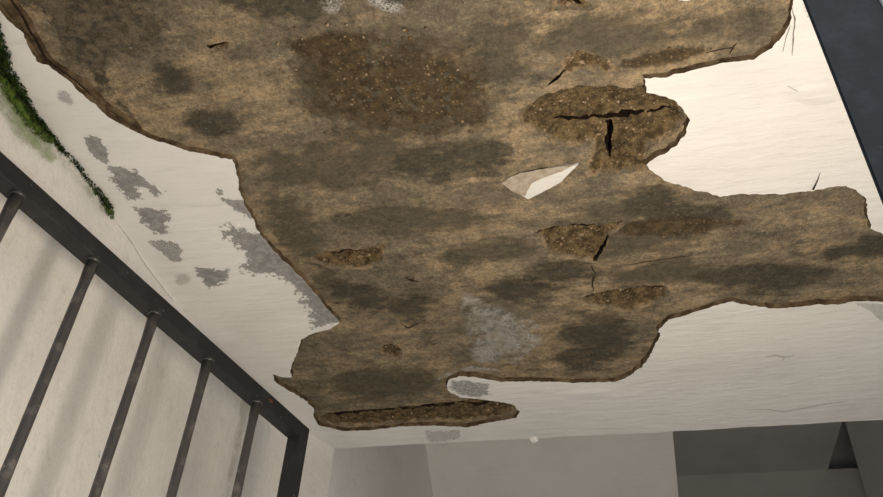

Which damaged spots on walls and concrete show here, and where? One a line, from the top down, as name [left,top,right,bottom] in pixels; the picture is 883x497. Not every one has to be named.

spalling [293,33,371,56]
spalling [622,48,705,68]
damp [256,14,523,189]
damp [184,109,241,138]
spalling [644,112,690,165]
peeling [83,136,184,262]
peeling [215,188,251,219]
spalling [620,214,715,240]
peeling [191,266,231,290]
peeling [219,222,339,330]
damp [335,185,883,402]
peeling [450,378,492,397]